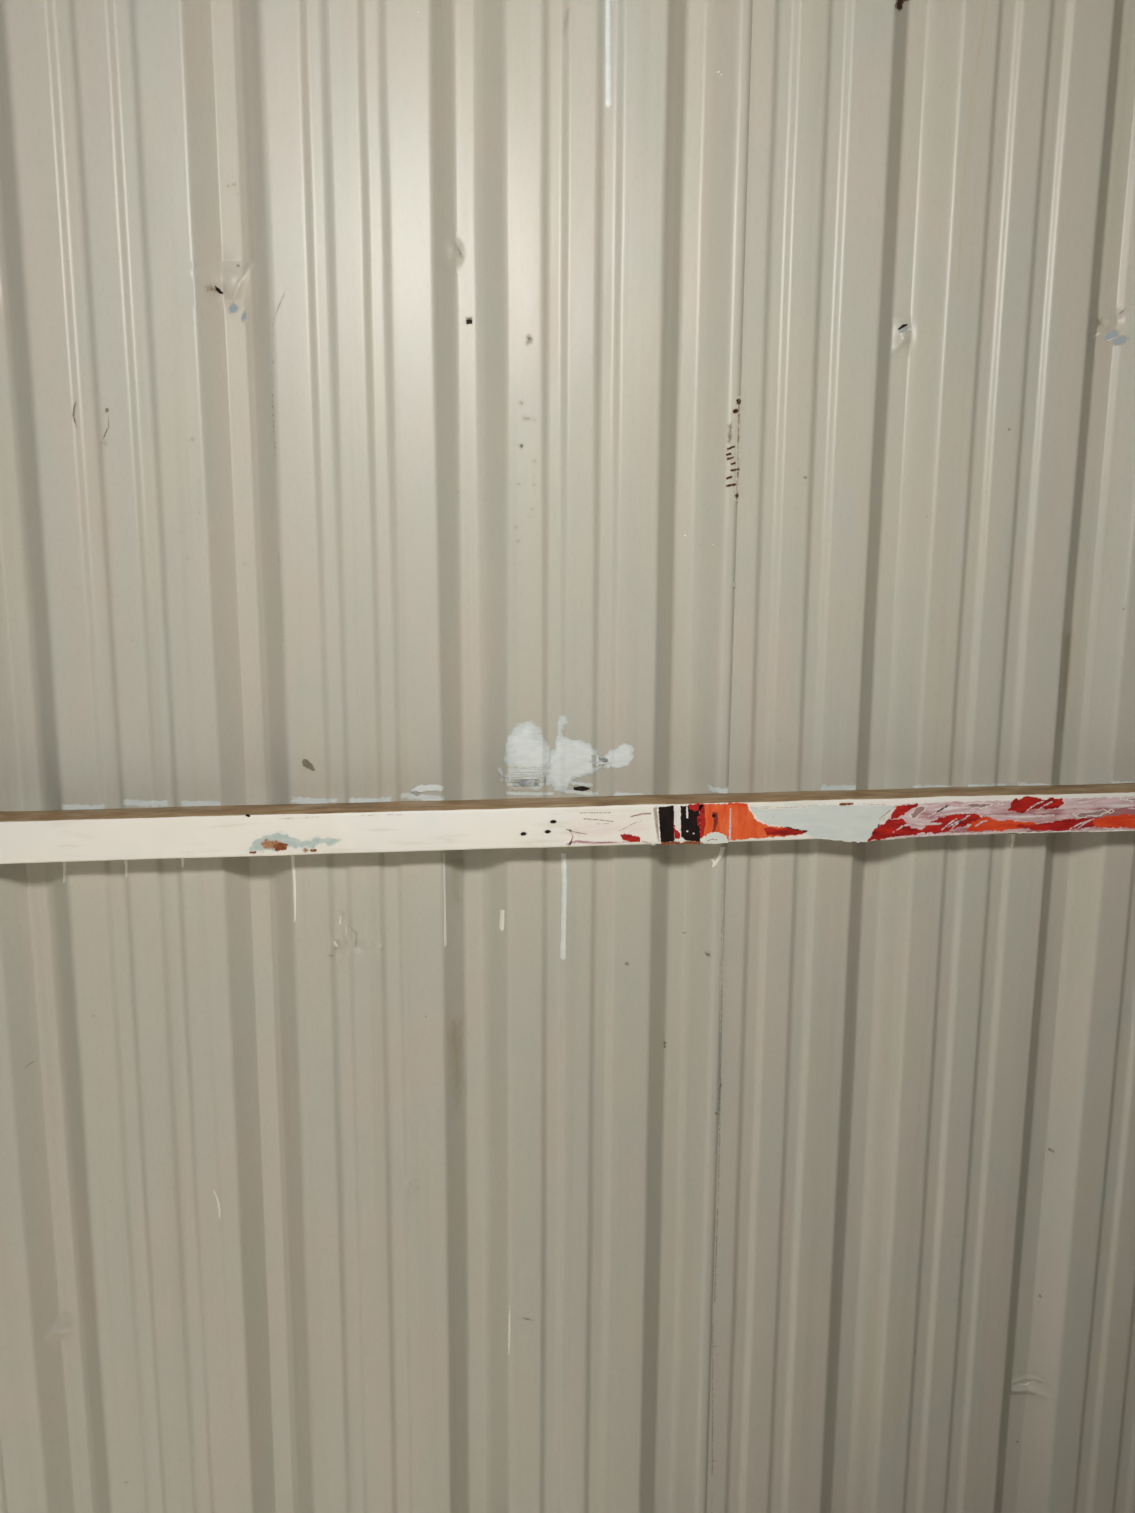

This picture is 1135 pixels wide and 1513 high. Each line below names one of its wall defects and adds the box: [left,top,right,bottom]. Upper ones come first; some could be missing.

rust [725,396,741,502]